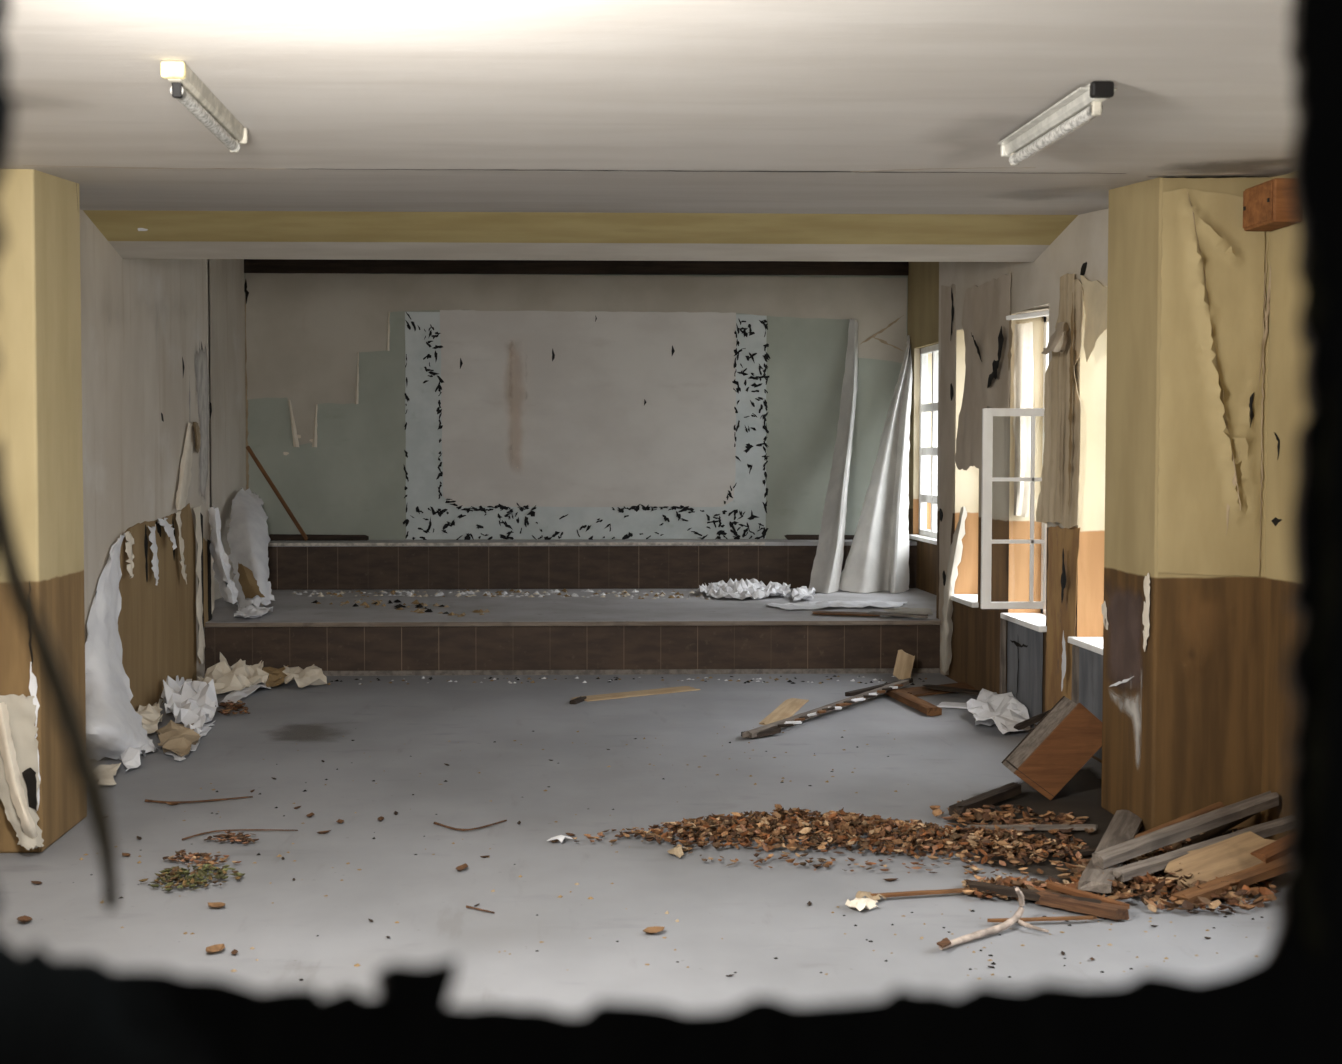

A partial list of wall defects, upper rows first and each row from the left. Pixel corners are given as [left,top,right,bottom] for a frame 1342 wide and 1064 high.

peeling [0,643,44,850]
peeling [85,422,275,761]
peeling [939,284,956,676]
peeling [1036,273,1109,712]